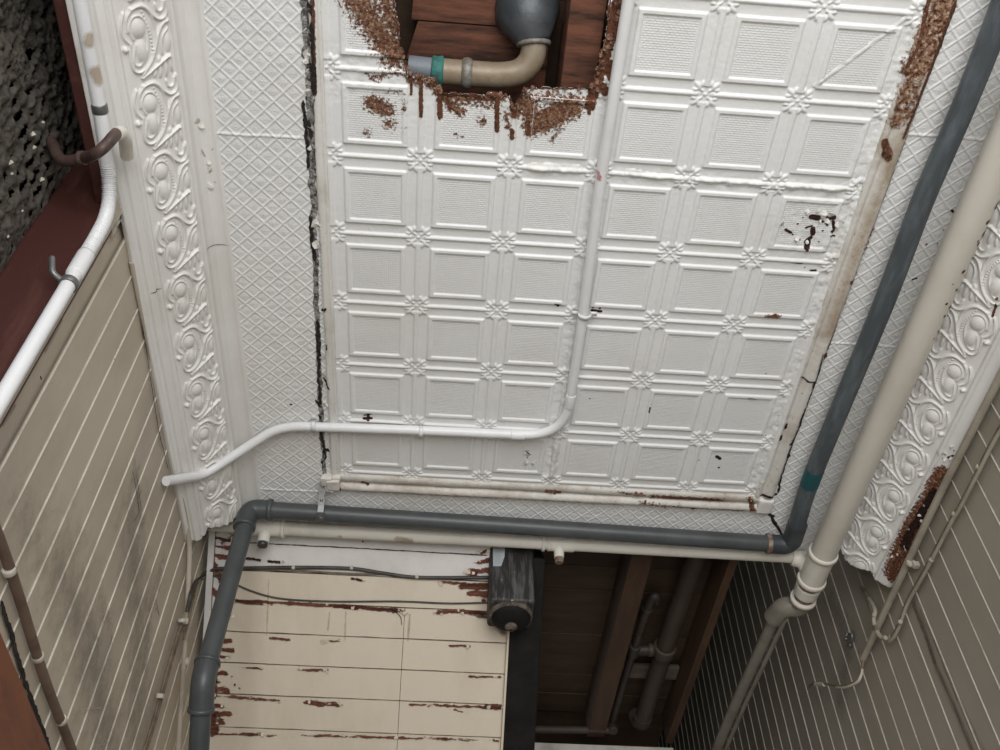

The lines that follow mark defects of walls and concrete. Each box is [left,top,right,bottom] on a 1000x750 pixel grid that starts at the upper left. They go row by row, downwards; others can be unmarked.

rust [334,0,622,144]
rust [881,0,958,189]
crack [299,0,341,491]
crack [760,4,957,535]
peeling [211,532,233,597]
peeling [230,599,409,618]
peeling [433,548,490,618]
rust [881,465,948,583]
peeling [210,638,281,737]
peeling [301,734,476,742]
peeling [409,703,503,712]